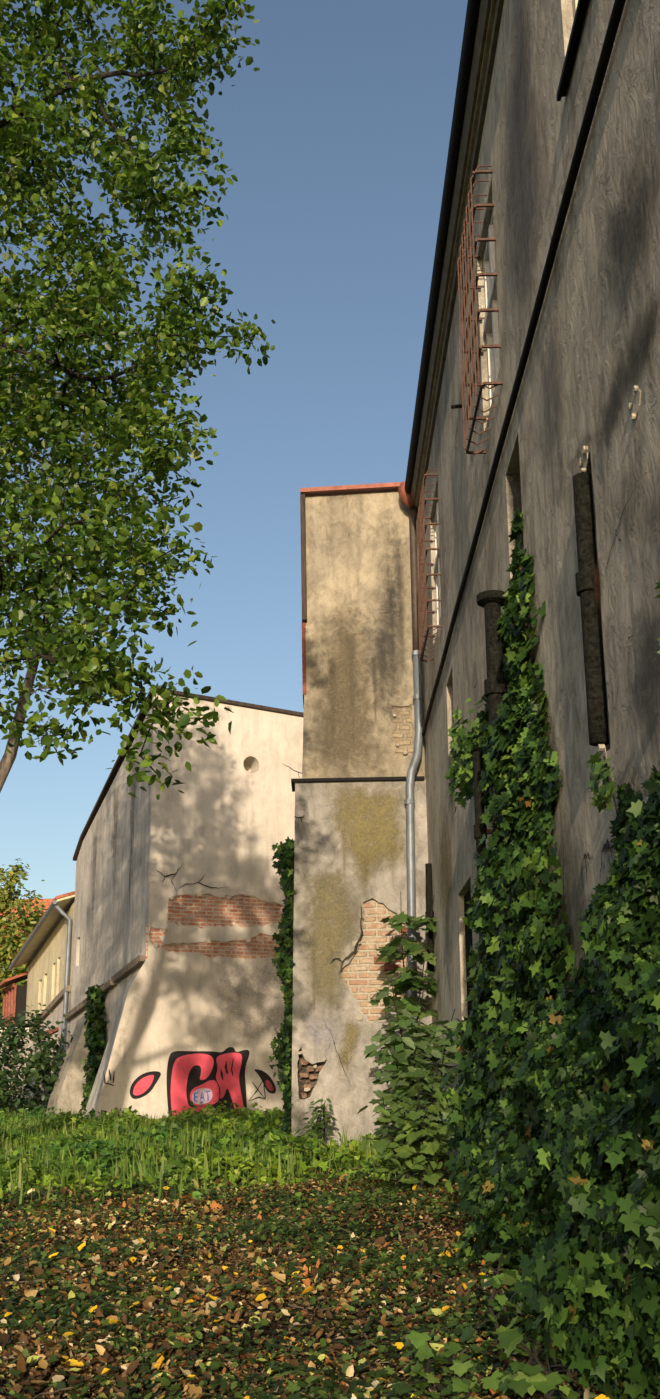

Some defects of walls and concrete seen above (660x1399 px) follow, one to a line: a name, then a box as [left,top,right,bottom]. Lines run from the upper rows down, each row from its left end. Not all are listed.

water stain [322,619,373,763]
water stain [378,576,397,695]
peeling [145,890,285,960]
spalling [336,899,408,1024]